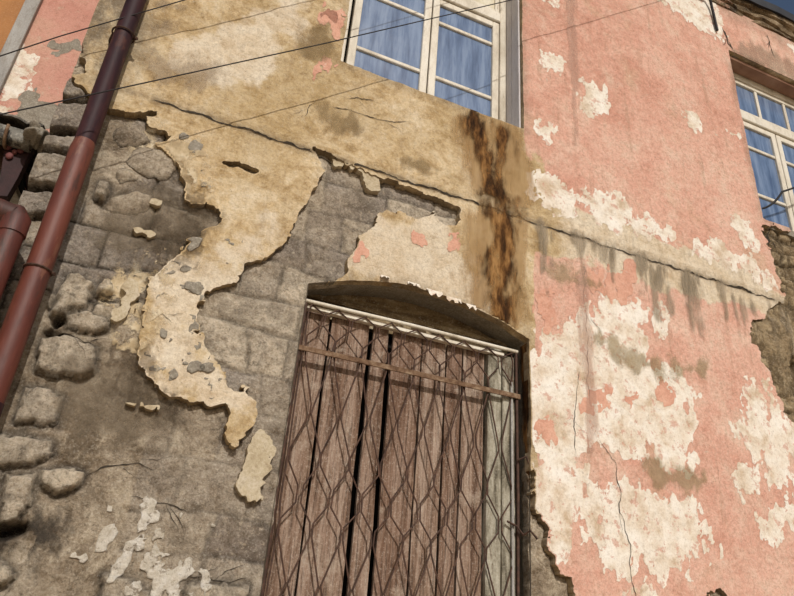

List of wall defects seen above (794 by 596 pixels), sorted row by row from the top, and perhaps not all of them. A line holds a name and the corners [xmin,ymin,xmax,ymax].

peeling [657,0,729,43]
spalling [0,39,89,329]
spalling [0,113,461,596]
crack [156,97,775,300]
rust [455,109,532,327]
water stain [572,232,616,271]
peeling [528,169,676,244]
peeling [521,258,724,596]
water stain [636,253,674,320]
water stain [682,269,701,335]
water stain [717,281,756,322]
spalling [692,213,794,549]